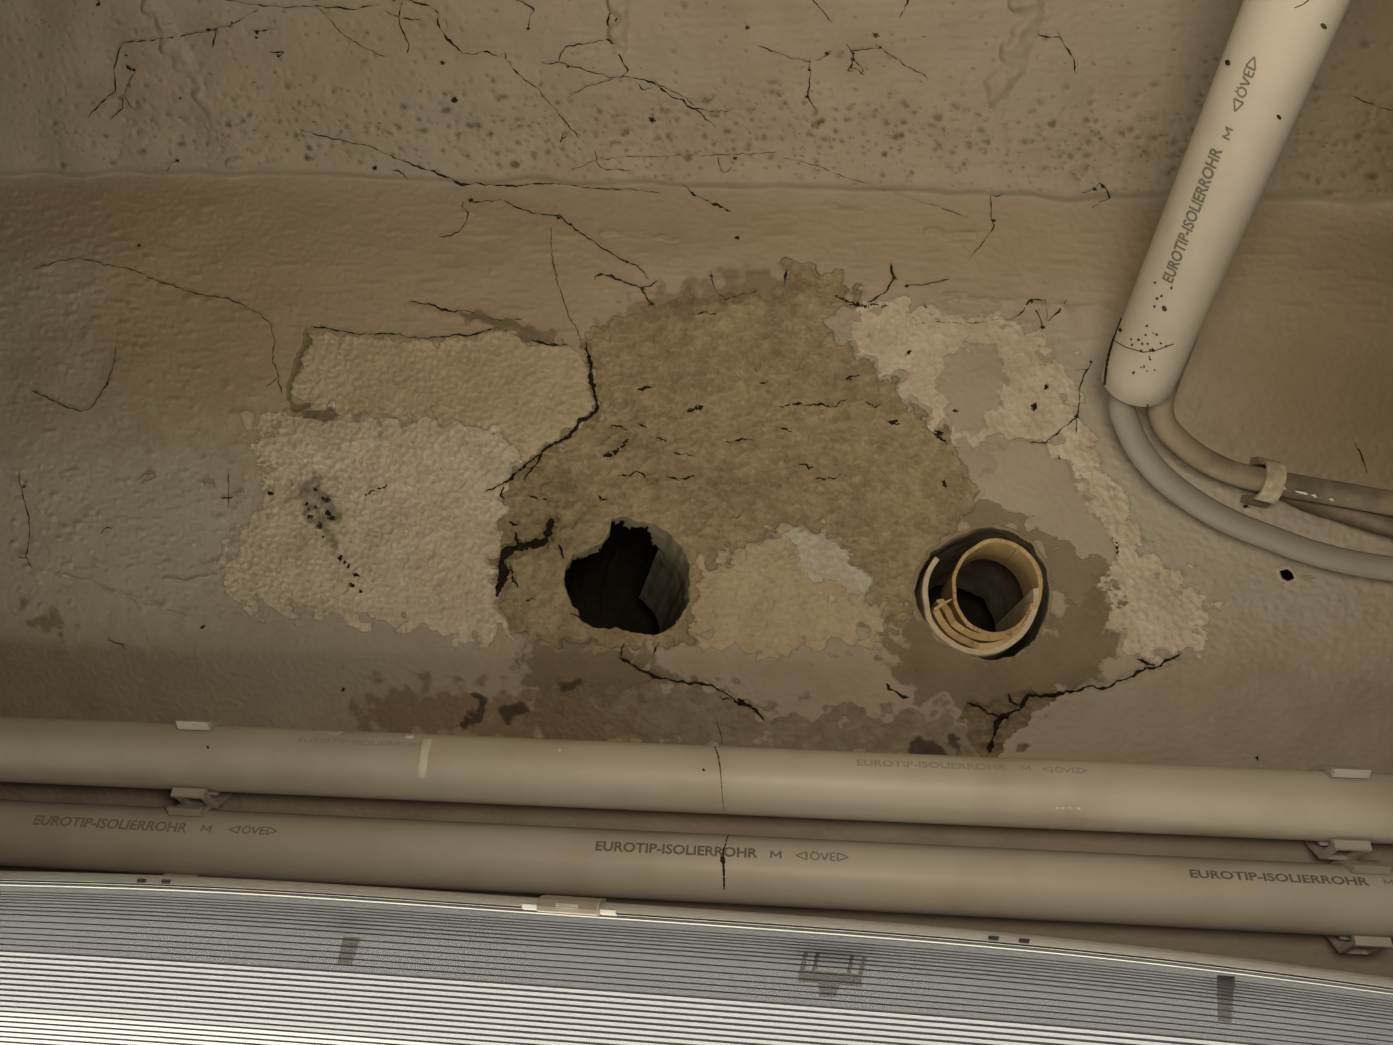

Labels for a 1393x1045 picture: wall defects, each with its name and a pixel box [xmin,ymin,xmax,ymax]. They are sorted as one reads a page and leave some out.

crack [1038,31,1076,73]
crack [227,0,962,216]
crack [835,295,1010,325]
peeling [286,329,337,421]
flaking render [488,257,980,650]
crack [620,642,765,721]
crack [886,683,910,699]
spalling [960,685,1058,757]
crack [966,653,1181,753]